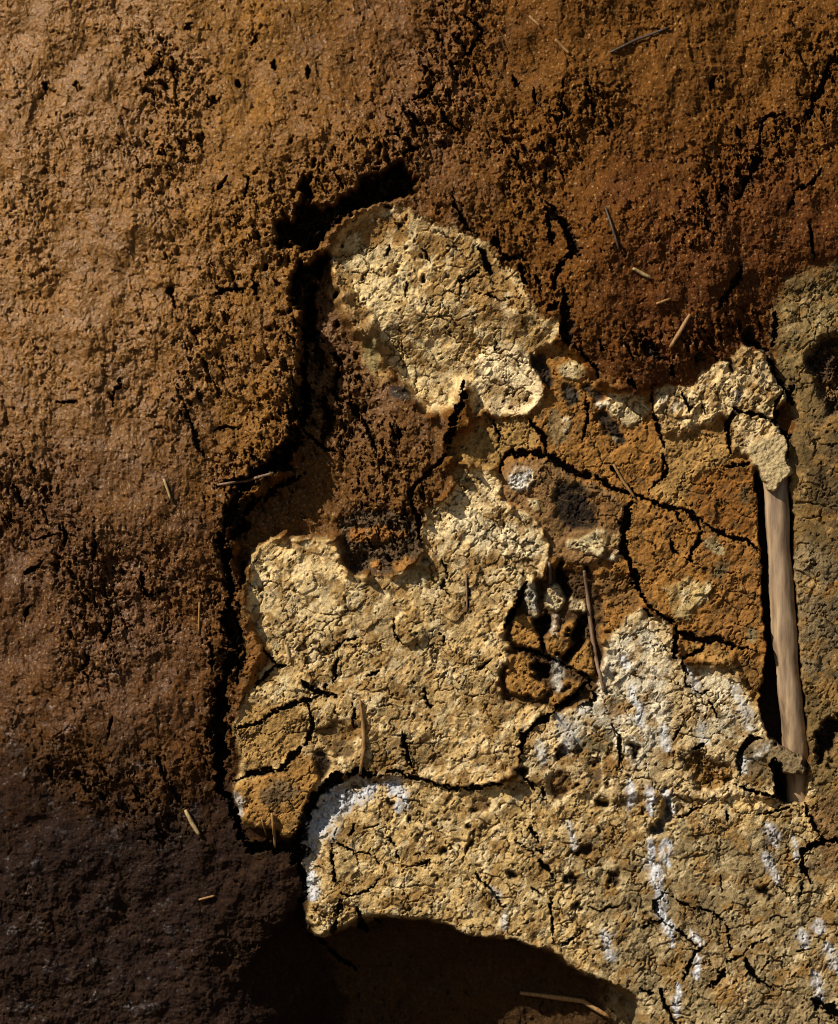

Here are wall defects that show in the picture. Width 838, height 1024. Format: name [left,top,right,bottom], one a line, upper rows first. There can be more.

crack [669,311,796,469]
crack [451,196,761,719]
spalling [232,160,838,1024]
crack [206,339,623,972]
crack [673,725,705,750]
leakage [308,782,408,849]
leakage [627,777,676,816]
leakage [307,871,317,901]
leakage [648,837,674,947]
crack [640,734,838,1024]
leakage [673,982,682,1017]
leakage [690,929,704,980]